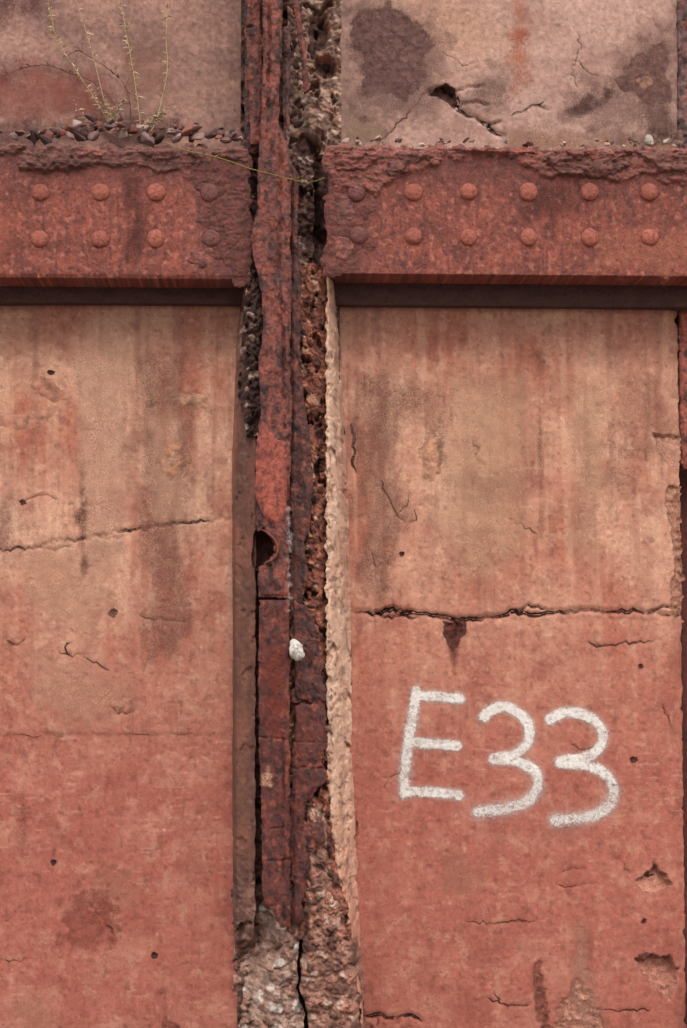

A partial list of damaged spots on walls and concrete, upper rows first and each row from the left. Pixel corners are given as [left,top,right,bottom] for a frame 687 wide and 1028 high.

crack [379,55,544,143]
corrosion [0,142,254,287]
corrosion [320,142,687,278]
crack [3,519,209,552]
spalling [232,0,457,1028]
spalling [443,619,466,652]
crack [358,604,680,635]
crack [588,640,650,648]
spalling [635,863,673,893]
spalling [533,961,604,1028]
spalling [634,952,679,1001]